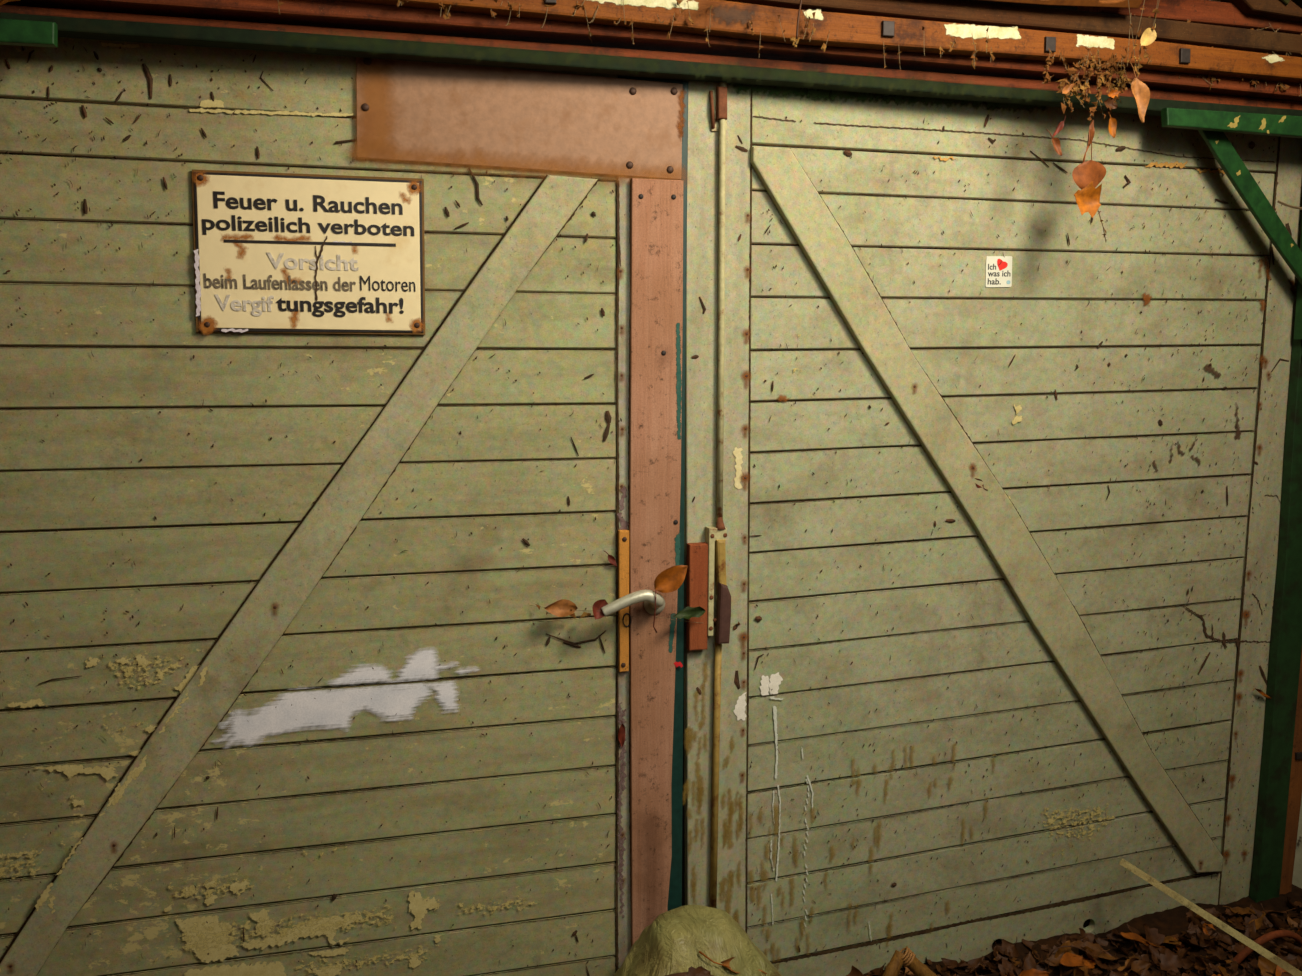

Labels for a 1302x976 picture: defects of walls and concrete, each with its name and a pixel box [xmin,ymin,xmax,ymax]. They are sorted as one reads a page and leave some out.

crack [1183,593,1270,649]
peeling [7,698,47,708]
peeling [85,651,208,734]
peeling [34,750,148,817]
rust [683,663,707,901]
peeling [0,837,83,914]
rust [720,773,798,969]
peeling [137,873,442,976]